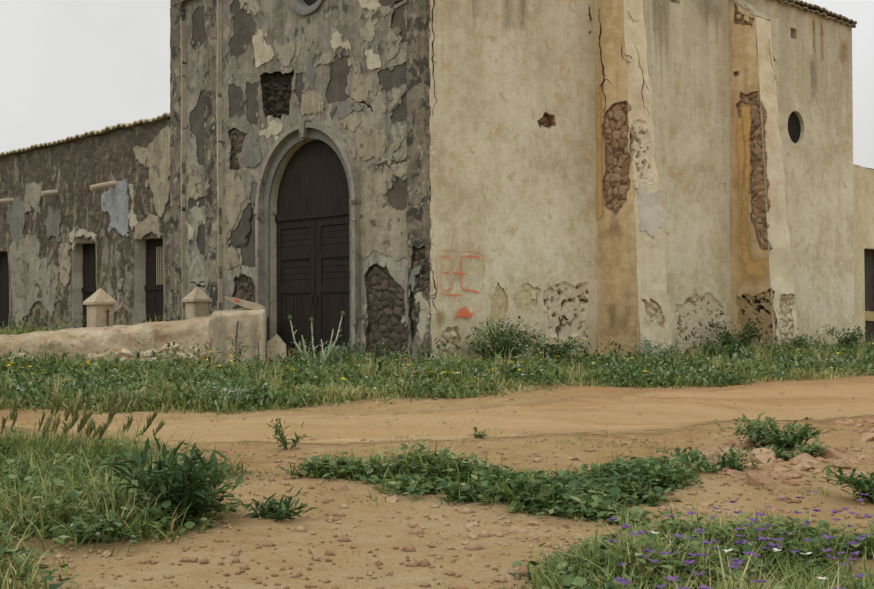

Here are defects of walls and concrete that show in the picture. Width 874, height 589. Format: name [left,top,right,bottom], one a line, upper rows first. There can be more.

peeling [101,124,170,240]
peeling [185,88,205,210]
peeling [222,0,407,310]
crack [423,0,437,115]
spalling [537,108,557,129]
spalling [601,100,664,238]
spalling [734,91,774,250]
peeling [7,181,97,330]
peeling [360,134,430,364]
spalling [474,281,590,360]
spalling [641,288,725,356]
spalling [736,288,795,348]